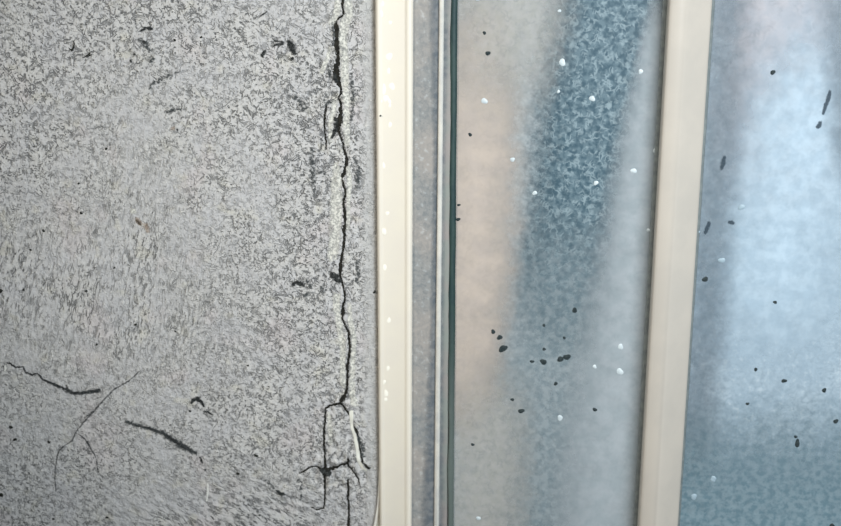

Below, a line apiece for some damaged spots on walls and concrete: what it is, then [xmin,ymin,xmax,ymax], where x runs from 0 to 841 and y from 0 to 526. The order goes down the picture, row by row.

crack [2,362,138,491]
crack [299,0,371,526]